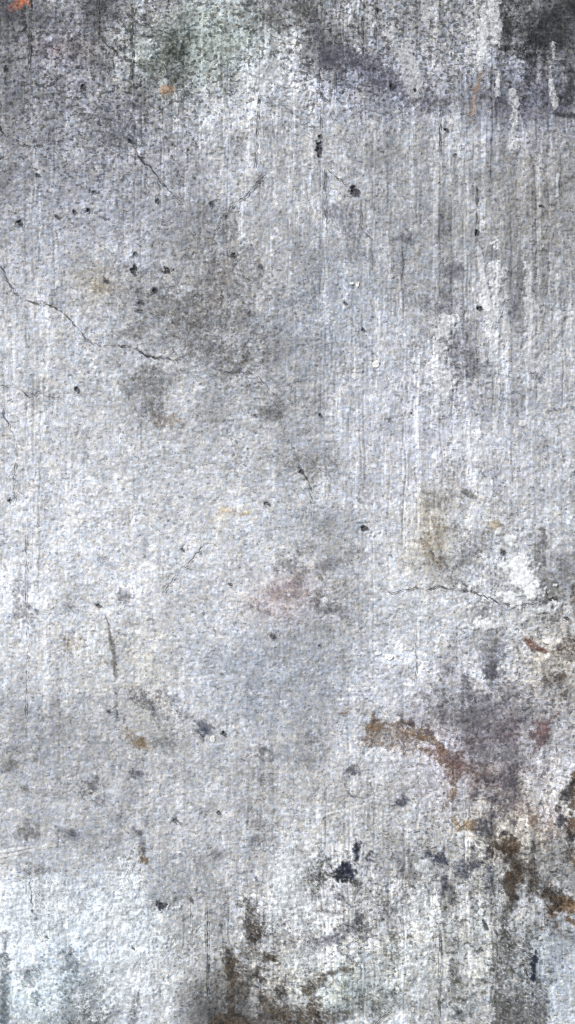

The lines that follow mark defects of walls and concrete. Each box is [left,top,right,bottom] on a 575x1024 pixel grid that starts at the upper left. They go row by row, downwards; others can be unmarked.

damp [494,0,574,86]
damp [554,68,575,118]
crack [0,266,186,360]
crack [382,585,566,606]
rust [363,711,478,831]
rust [497,712,559,751]
damp [209,843,368,1024]
damp [329,838,372,883]
damp [416,780,569,1024]
rust [489,831,524,901]
rust [540,886,575,931]
rust [559,771,575,866]